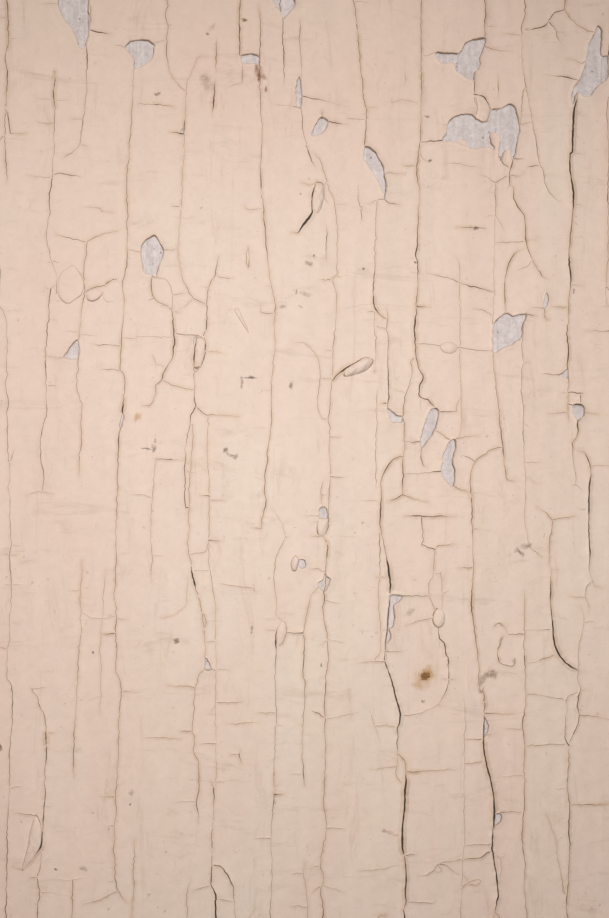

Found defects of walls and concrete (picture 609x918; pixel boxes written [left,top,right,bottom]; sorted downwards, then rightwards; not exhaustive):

peeling [54,0,94,53]
peeling [121,36,159,73]
peeling [432,34,489,84]
crack [0,0,26,184]
peeling [439,101,523,166]
peeling [359,143,390,197]
peeling [137,231,168,281]
peeling [489,310,530,357]
crack [25,0,257,918]
crack [226,0,609,918]
peeling [416,404,460,490]
crack [0,264,54,918]